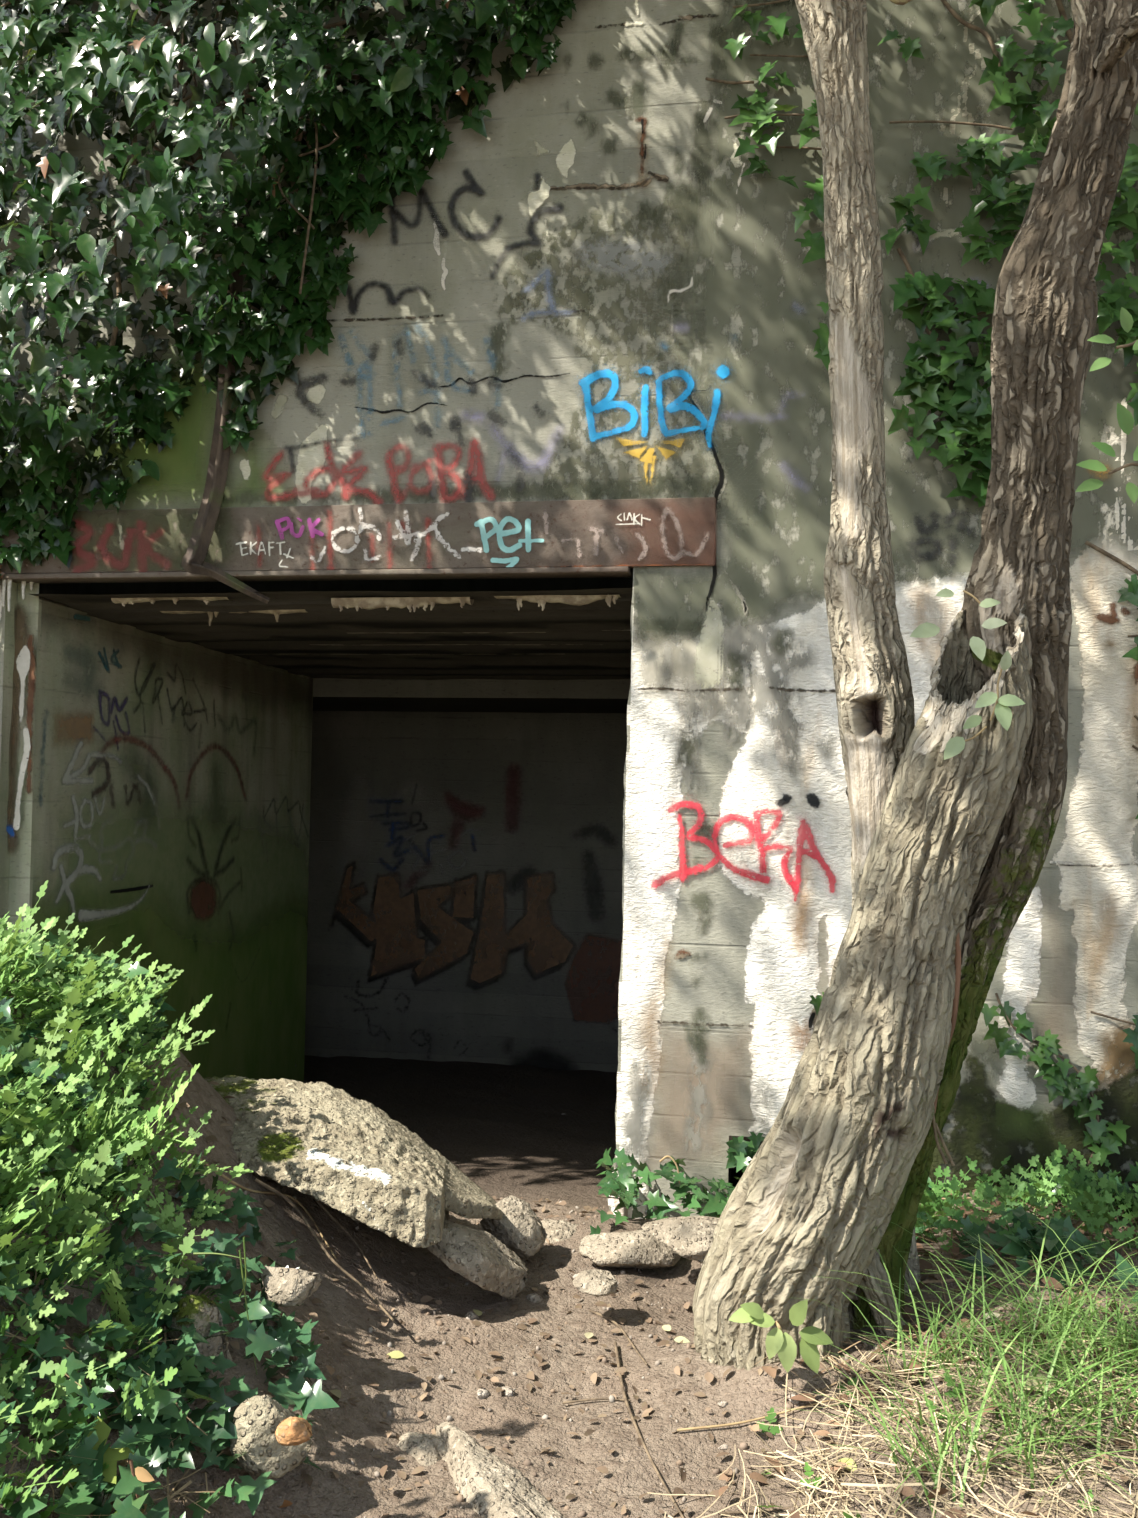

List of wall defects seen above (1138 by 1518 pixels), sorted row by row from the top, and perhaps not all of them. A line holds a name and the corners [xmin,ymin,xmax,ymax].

rust [635,117,647,173]
leakage [1095,226,1138,301]
crack [355,373,570,414]
leakage [866,0,1073,725]
leakage [317,0,852,1219]
spalling [1096,602,1131,624]
peeling [6,645,31,837]
spalling [809,1009,818,1030]